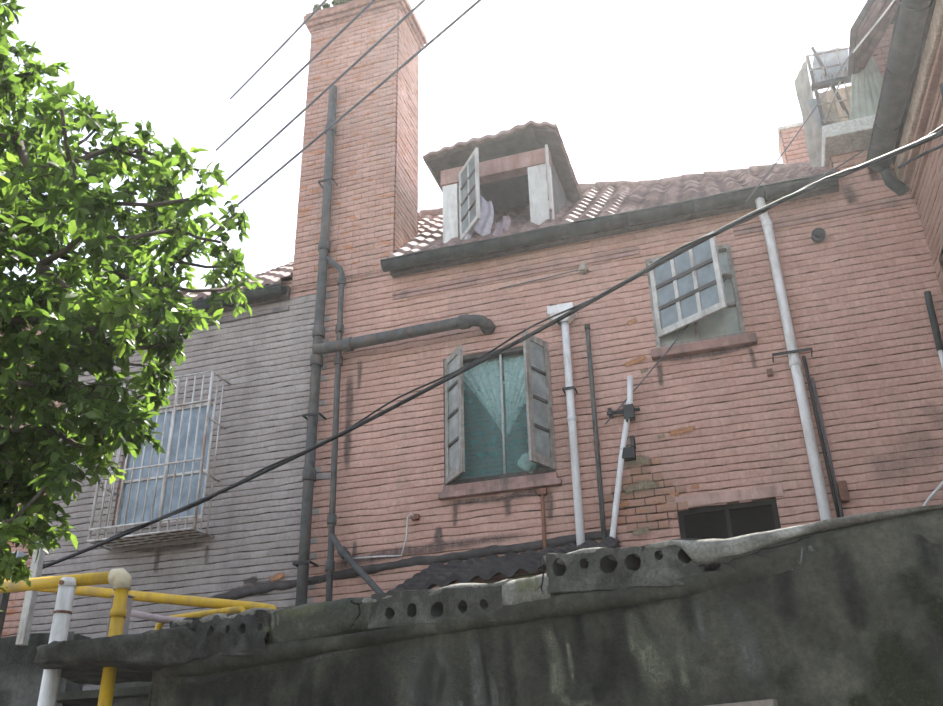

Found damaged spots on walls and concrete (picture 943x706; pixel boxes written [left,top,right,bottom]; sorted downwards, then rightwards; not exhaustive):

leakage [344,362,361,463]
leakage [545,615,614,706]